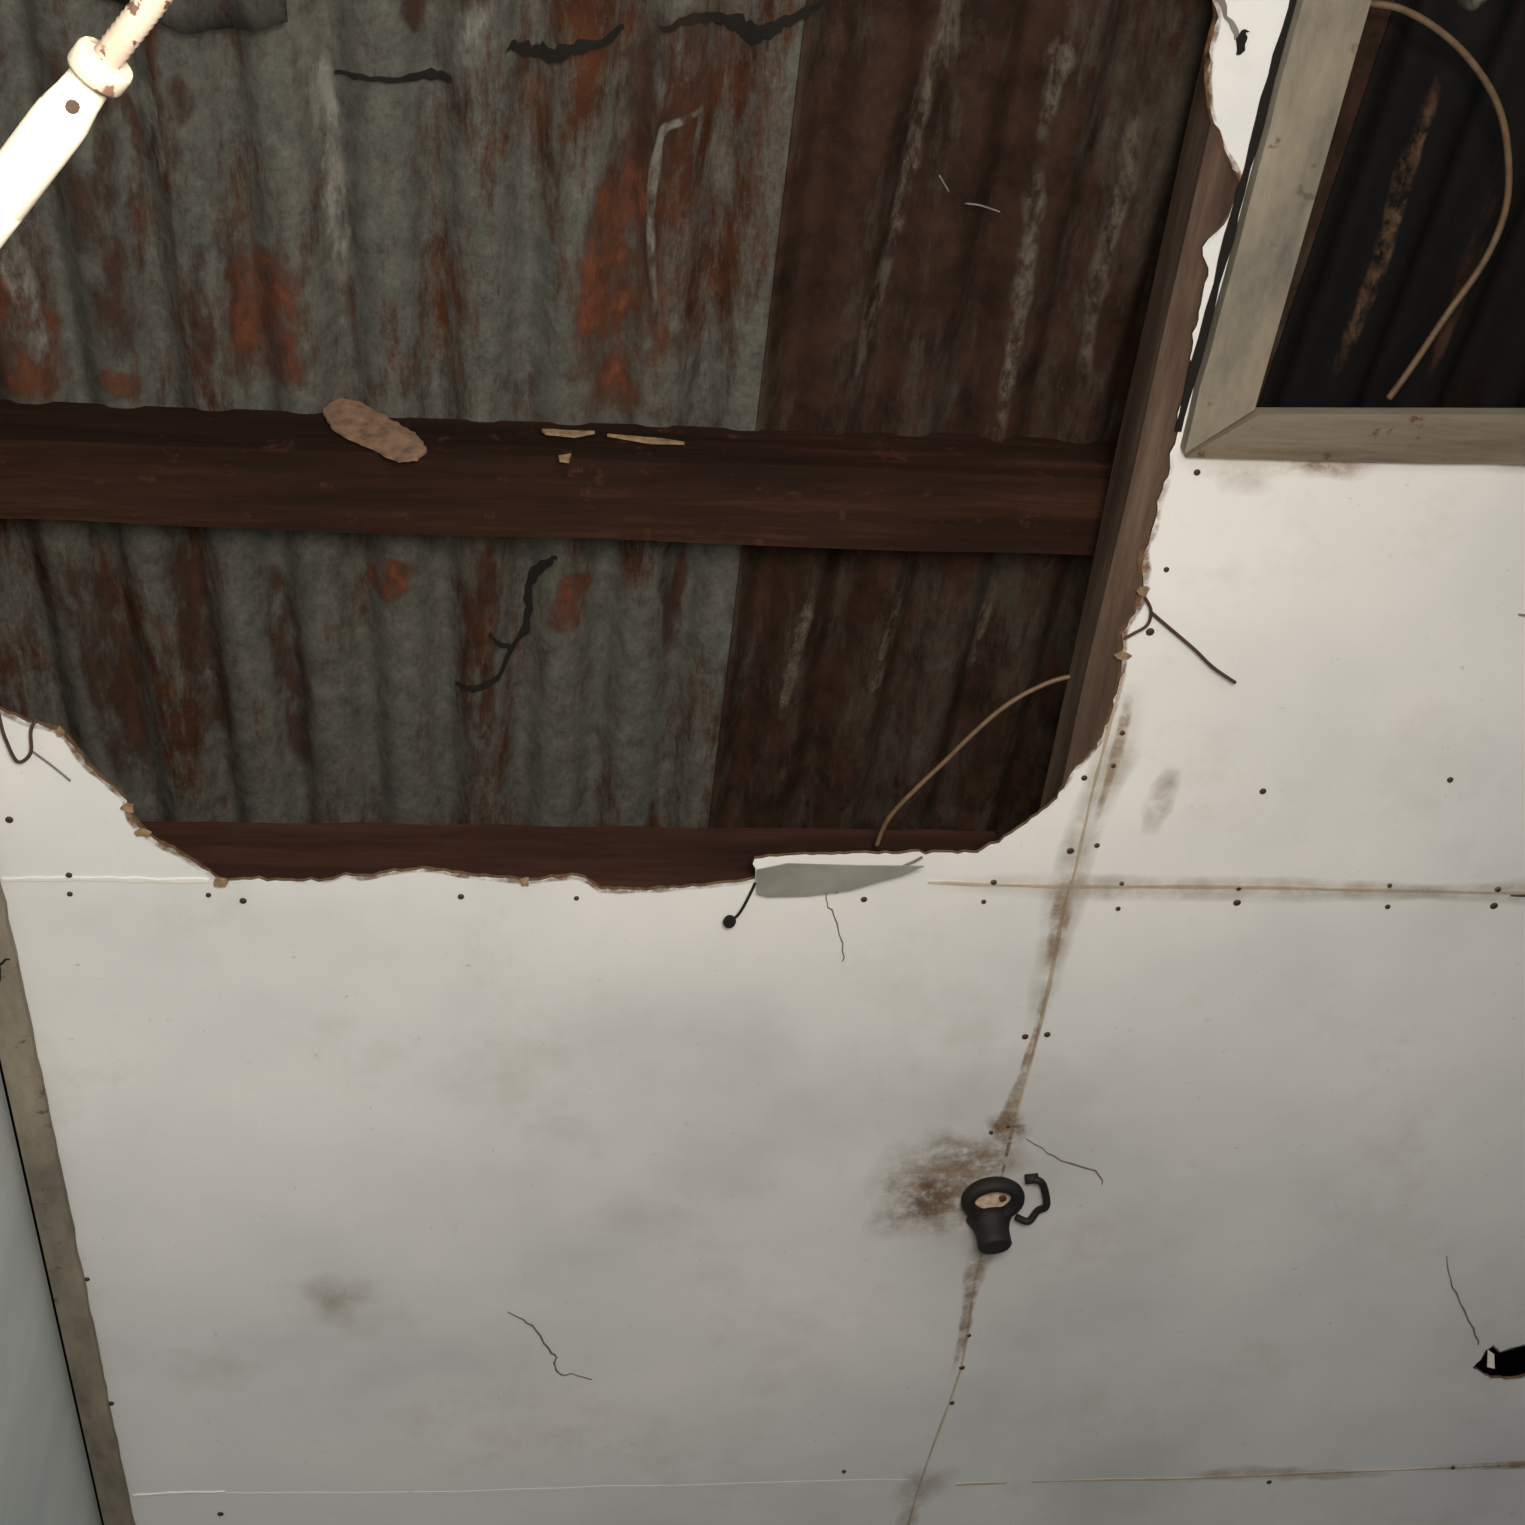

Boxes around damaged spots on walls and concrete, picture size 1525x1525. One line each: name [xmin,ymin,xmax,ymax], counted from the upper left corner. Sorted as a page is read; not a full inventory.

corrosion [402,0,425,29]
corrosion [51,57,66,82]
spalling [1205,0,1242,180]
corrosion [65,92,163,335]
peeling [323,398,427,463]
peeling [542,429,684,463]
spalling [1114,538,1152,681]
spalling [47,724,191,861]
peeling [756,863,924,897]
damp [909,1151,992,1214]
crack [508,1312,592,1380]
peeling [1487,1350,1495,1369]